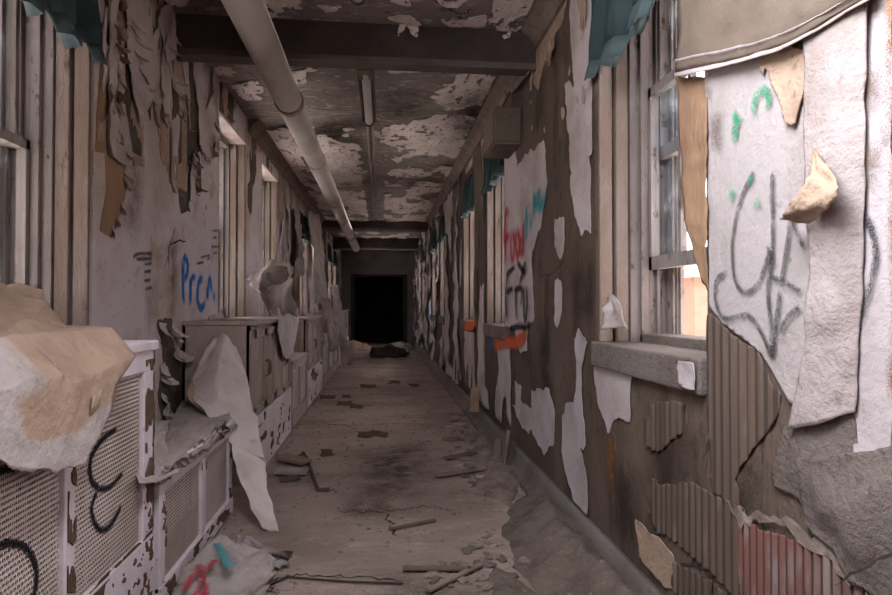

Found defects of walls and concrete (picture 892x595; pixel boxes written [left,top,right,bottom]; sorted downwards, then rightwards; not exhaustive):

peeling [95,0,264,239]
flaking render [245,0,632,515]
peeling [634,39,870,595]
peeling [853,0,892,452]
spalling [67,566,76,593]
spalling [67,467,77,546]
flaking render [93,318,194,595]
crack [834,553,892,586]